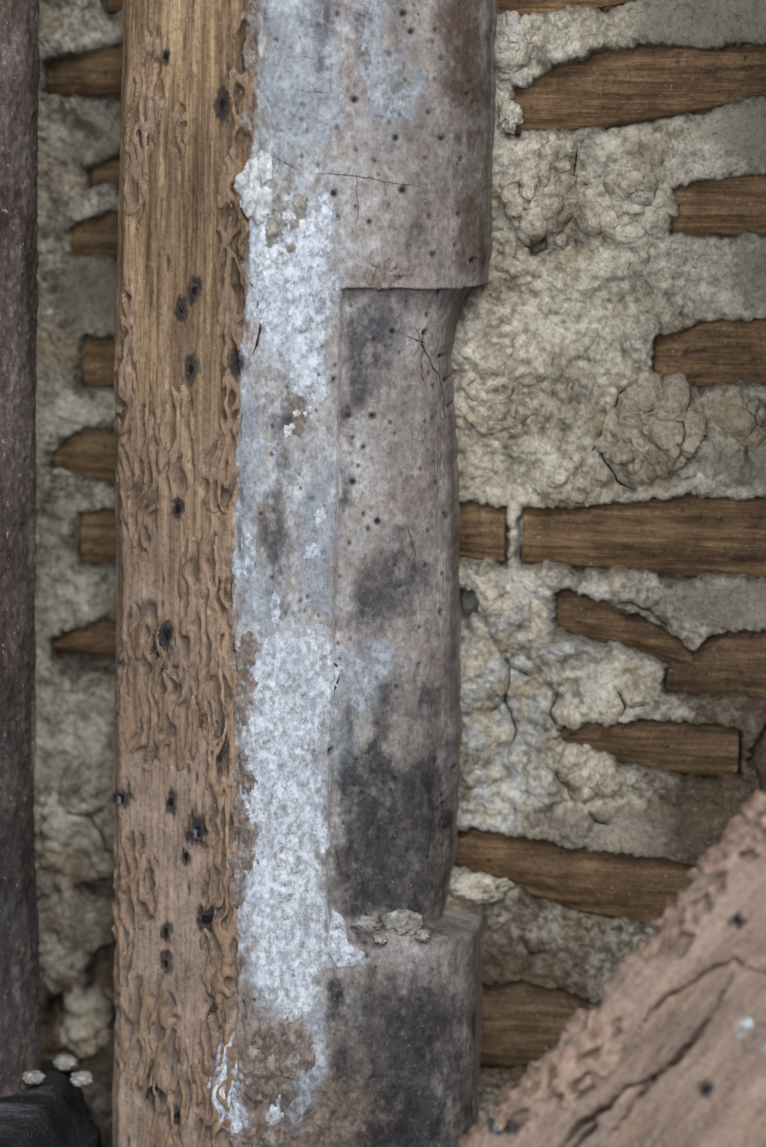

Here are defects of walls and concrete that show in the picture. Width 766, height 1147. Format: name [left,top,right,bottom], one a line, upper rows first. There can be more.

water stain [233,349,244,375]
water stain [348,307,400,409]
water stain [262,498,290,584]
water stain [355,563,429,625]
crack [549,687,560,726]
crack [615,688,645,717]
water stain [335,719,452,920]
crack [556,774,610,832]
water stain [330,980,343,1008]
water stain [334,979,527,1147]
crack [566,958,766,1147]